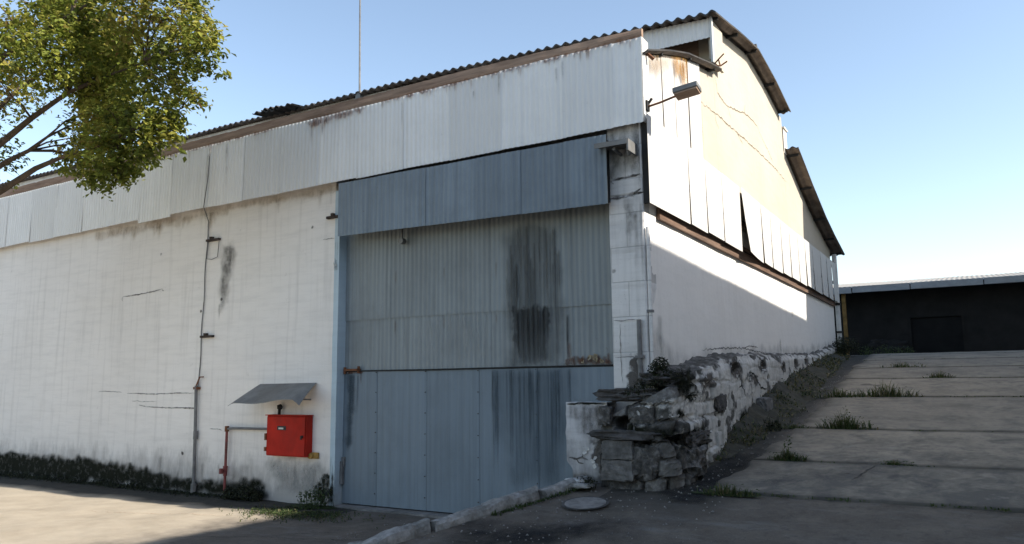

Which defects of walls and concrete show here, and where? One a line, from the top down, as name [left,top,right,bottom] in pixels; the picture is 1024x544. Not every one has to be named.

crack [702,76,784,179]
crack [99,391,194,409]